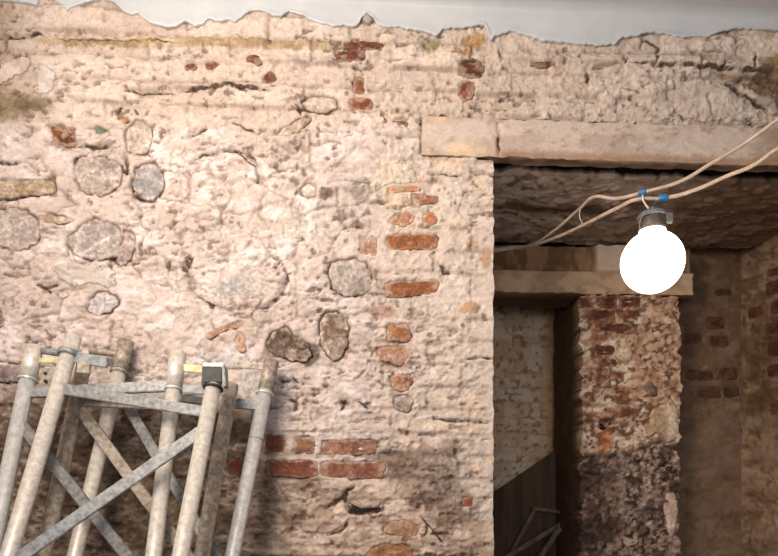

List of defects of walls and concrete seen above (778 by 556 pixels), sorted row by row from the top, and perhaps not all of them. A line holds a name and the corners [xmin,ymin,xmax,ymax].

flaking render [51,0,778,47]
crack [633,40,775,128]